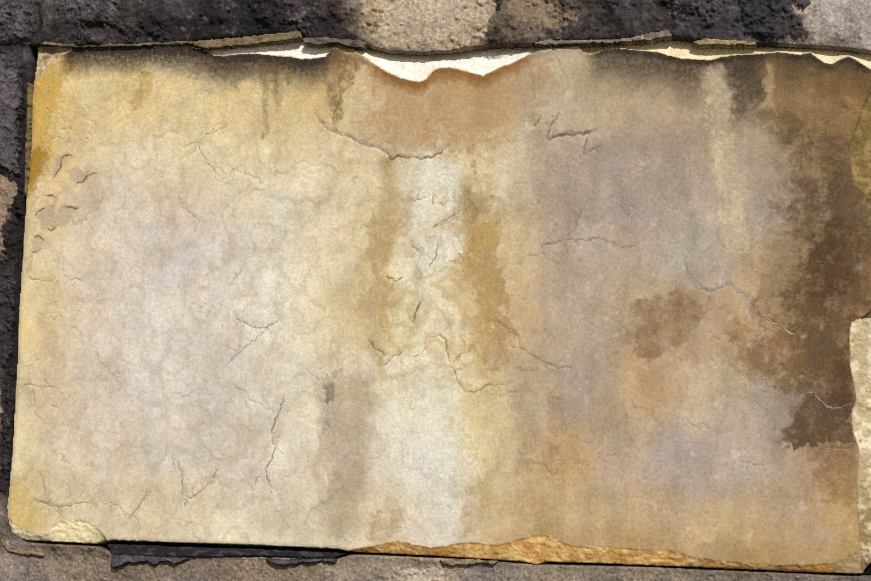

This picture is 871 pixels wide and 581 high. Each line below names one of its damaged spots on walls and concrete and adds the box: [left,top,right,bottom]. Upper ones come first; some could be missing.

spalling [203,41,336,59]
spalling [353,0,871,82]
crack [535,119,596,154]
water stain [705,65,750,252]
spalling [849,92,871,242]
spalling [850,308,871,570]
spalling [8,518,111,544]
spalling [266,535,834,581]